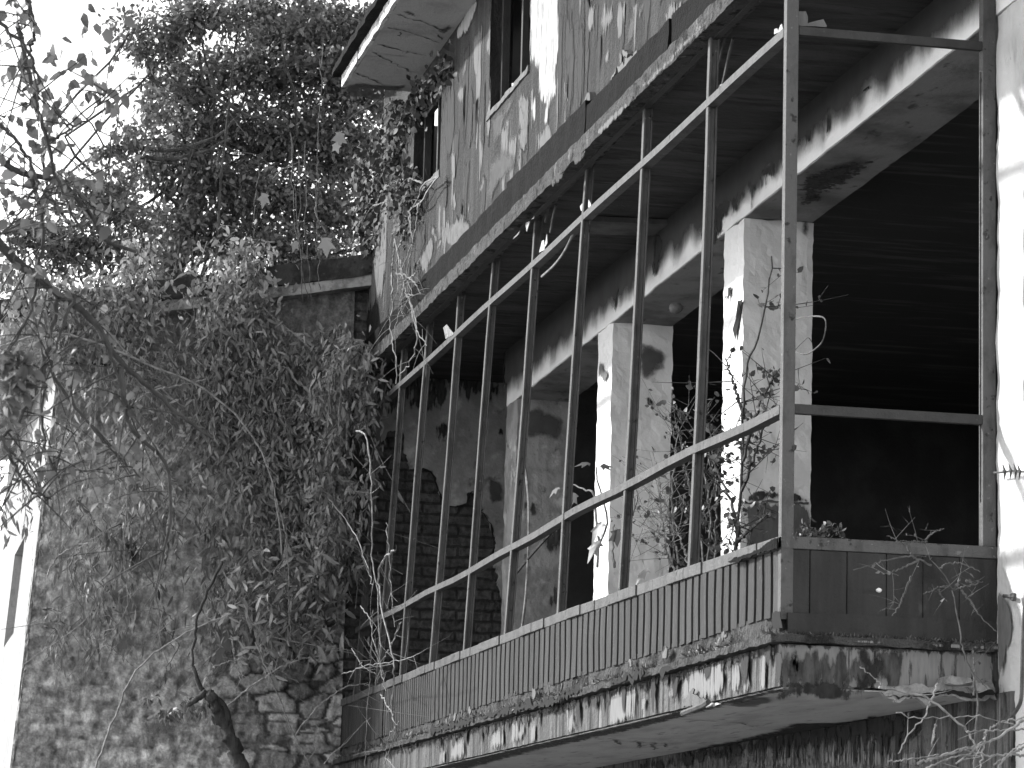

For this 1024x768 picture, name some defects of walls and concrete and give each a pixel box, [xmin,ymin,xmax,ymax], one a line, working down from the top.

peeling [457,1,477,39]
peeling [518,0,568,152]
spalling [611,49,639,80]
damp [642,26,701,86]
damp [797,0,979,152]
damp [366,0,681,319]
peeling [414,200,470,272]
damp [384,124,783,414]
damp [528,409,562,439]
damp [489,477,502,502]
spalling [371,468,499,656]
spalling [879,675,997,706]